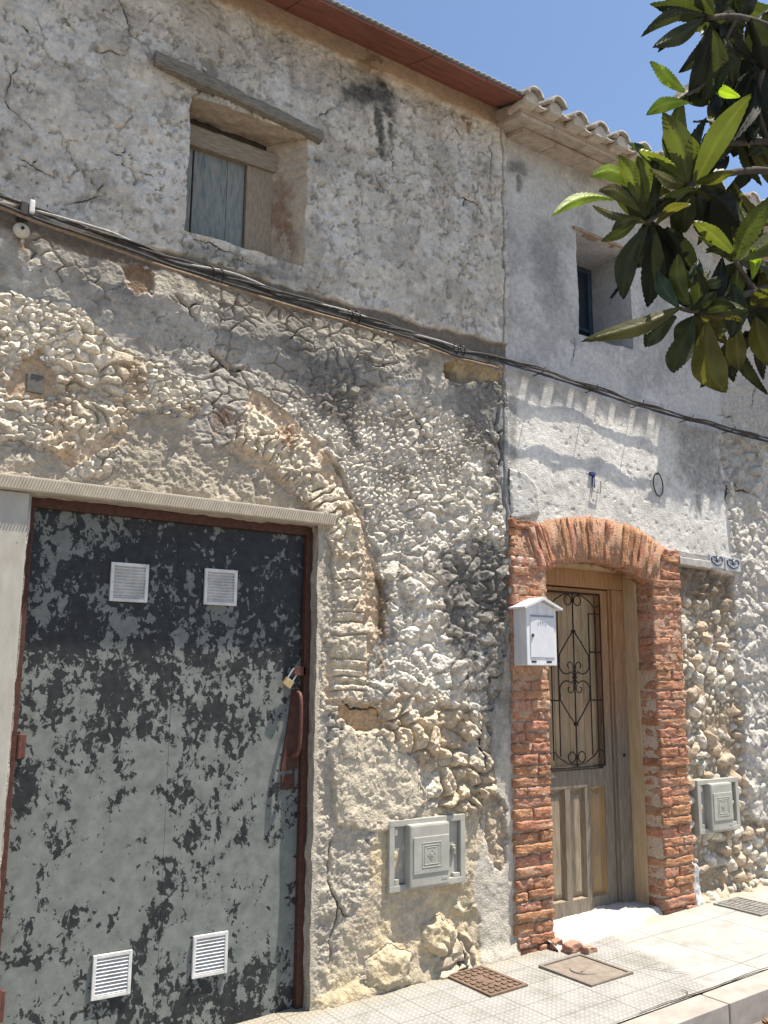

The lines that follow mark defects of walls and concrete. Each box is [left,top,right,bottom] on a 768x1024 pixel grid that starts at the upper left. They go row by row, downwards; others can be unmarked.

water stain [343,54,394,156]
spalling [122,265,155,296]
spalling [0,290,209,482]
spalling [443,359,500,385]
spalling [676,565,768,903]
crack [327,844,346,966]